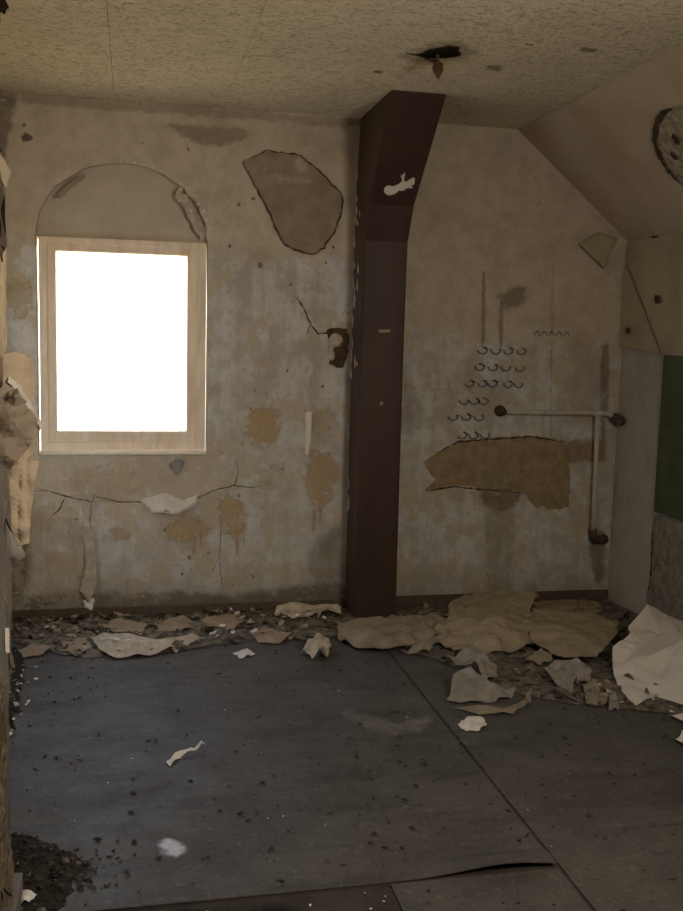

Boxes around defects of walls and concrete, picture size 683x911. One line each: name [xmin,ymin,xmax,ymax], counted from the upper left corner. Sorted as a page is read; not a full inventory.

spalling [407,45,462,79]
spalling [651,105,683,185]
spalling [242,150,344,255]
peeling [384,173,415,195]
peeling [0,149,44,560]
spalling [327,262,359,378]
crack [36,490,141,526]
peeling [140,492,199,515]
crack [198,461,261,498]
spalling [424,436,606,511]